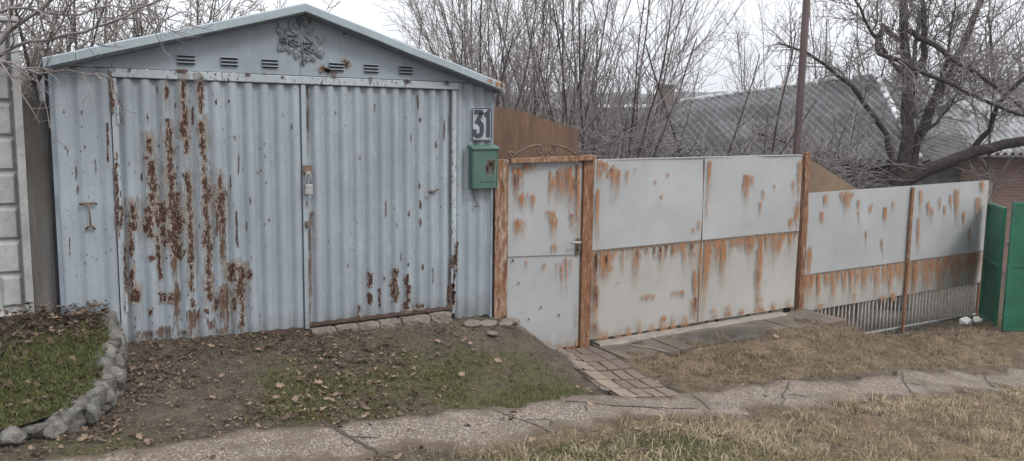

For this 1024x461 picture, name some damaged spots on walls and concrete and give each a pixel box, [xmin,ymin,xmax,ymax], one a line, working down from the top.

corrosion [316,58,352,75]
corrosion [106,71,254,340]
corrosion [511,164,535,233]
corrosion [549,164,580,231]
corrosion [357,268,425,318]
corrosion [446,241,459,309]
corrosion [543,210,572,281]
corrosion [592,160,985,340]